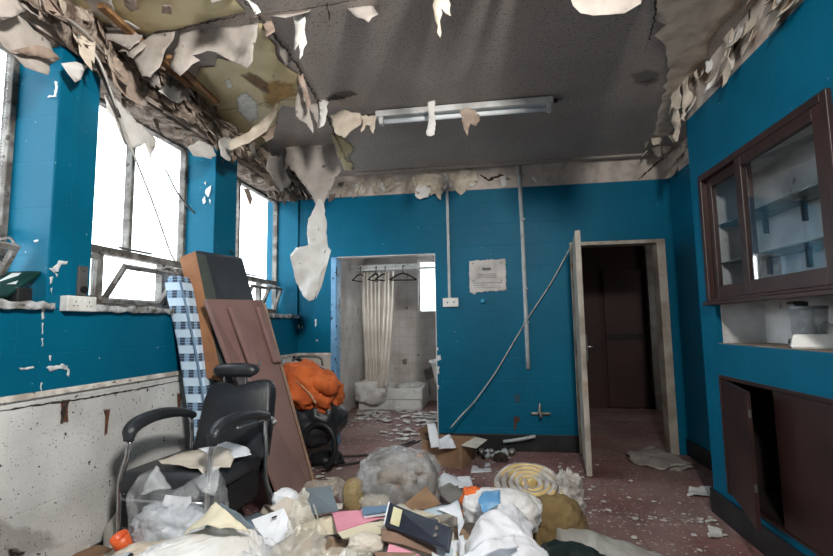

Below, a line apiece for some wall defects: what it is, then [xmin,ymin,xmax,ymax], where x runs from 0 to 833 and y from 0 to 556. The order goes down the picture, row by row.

water stain [242,74,295,108]
peeling [638,0,800,179]
flaking render [0,0,510,301]
spalling [46,355,70,377]
rust [60,399,71,424]